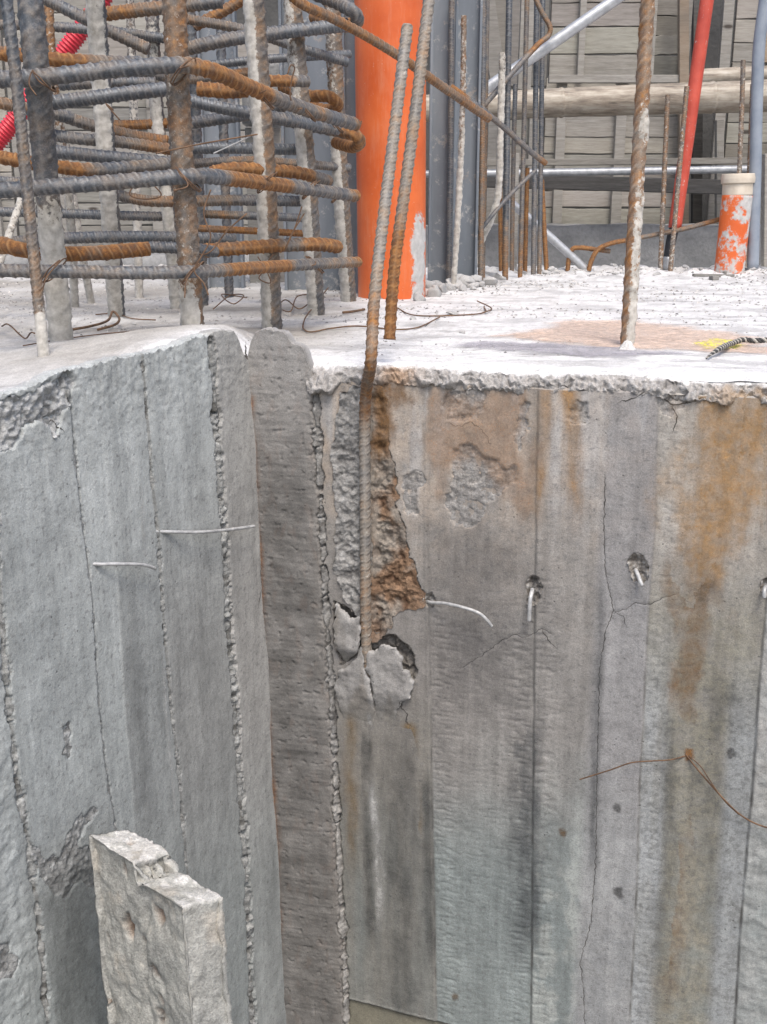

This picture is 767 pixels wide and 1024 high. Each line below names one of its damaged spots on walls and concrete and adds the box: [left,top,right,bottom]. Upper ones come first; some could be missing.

spalling [0,371,74,452]
spalling [306,360,767,724]
crack [464,628,554,667]
crack [579,481,677,1022]
peeling [30,807,98,898]
water stain [367,789,383,922]